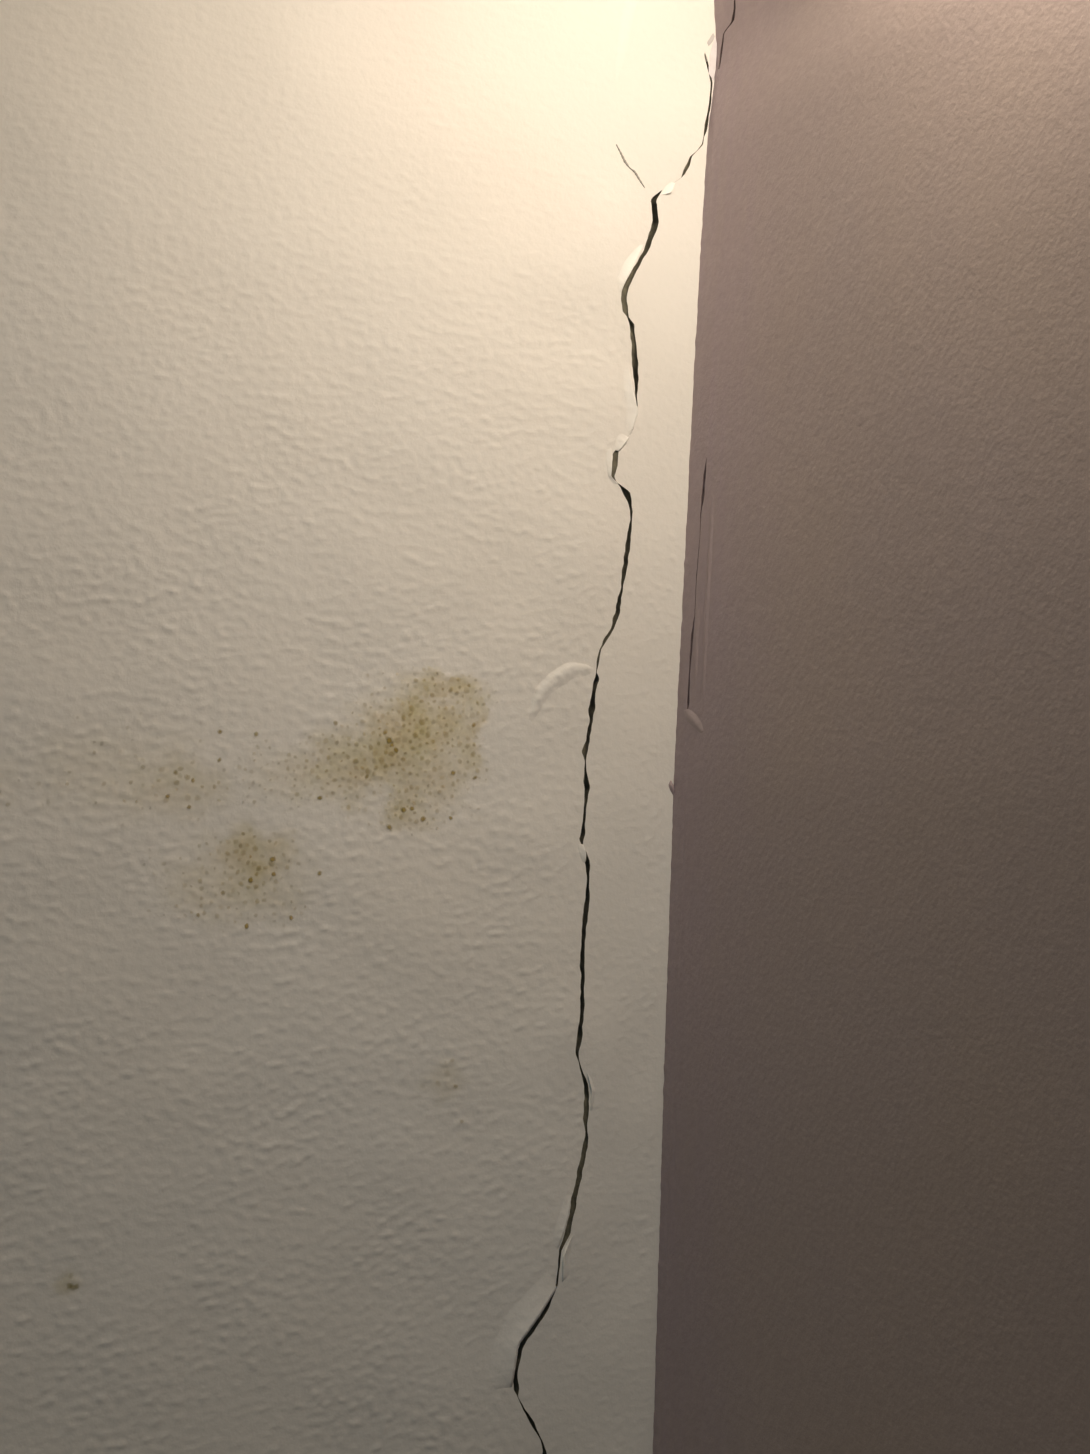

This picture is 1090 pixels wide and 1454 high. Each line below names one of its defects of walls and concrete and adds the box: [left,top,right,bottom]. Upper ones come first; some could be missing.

crack [488,0,736,1454]